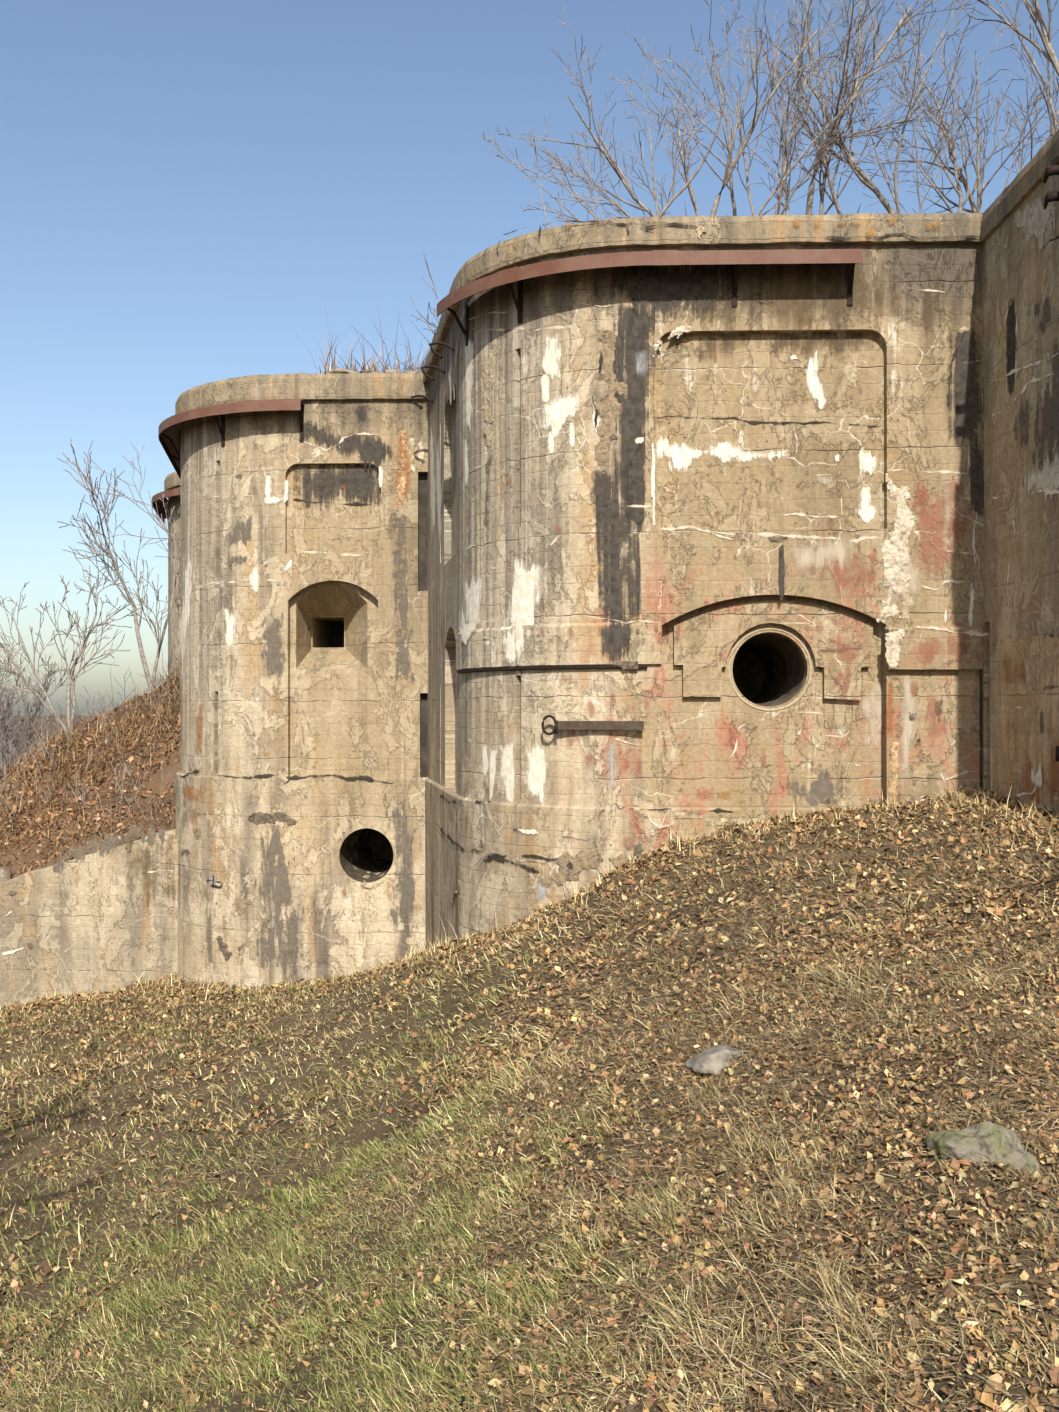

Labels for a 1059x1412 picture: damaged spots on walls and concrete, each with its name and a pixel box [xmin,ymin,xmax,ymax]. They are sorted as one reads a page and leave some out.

crack [827,156,1059,240]
leakage [1014,195,1056,252]
crack [891,303,1059,606]
leakage [1006,297,1059,502]
crack [180,770,393,784]
crack [730,724,781,775]
crack [797,626,989,768]
leakage [254,826,308,974]